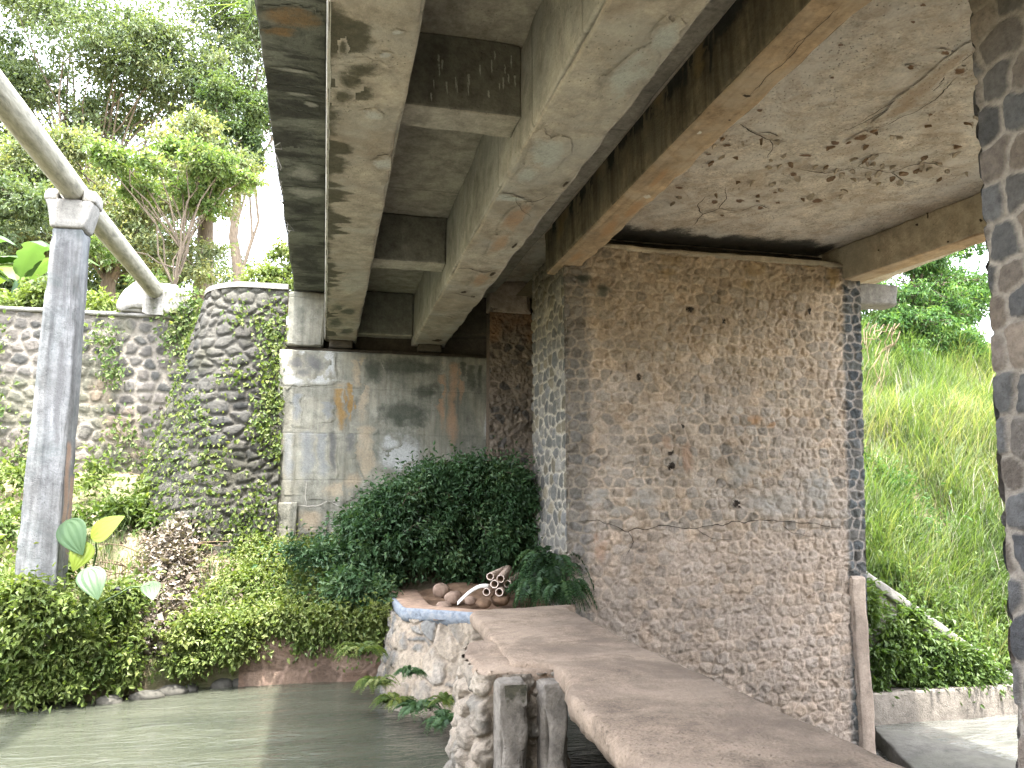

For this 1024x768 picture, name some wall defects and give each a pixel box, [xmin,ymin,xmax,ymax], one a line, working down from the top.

crack [840,54,972,133]
water stain [266,0,361,336]
water stain [371,155,391,173]
peeling [708,137,744,167]
crack [739,123,785,157]
peeling [736,138,801,203]
peeling [813,127,962,199]
crack [695,188,769,224]
rust [331,371,356,440]
water stain [280,351,490,498]
rust [434,360,465,463]
crack [581,520,853,554]